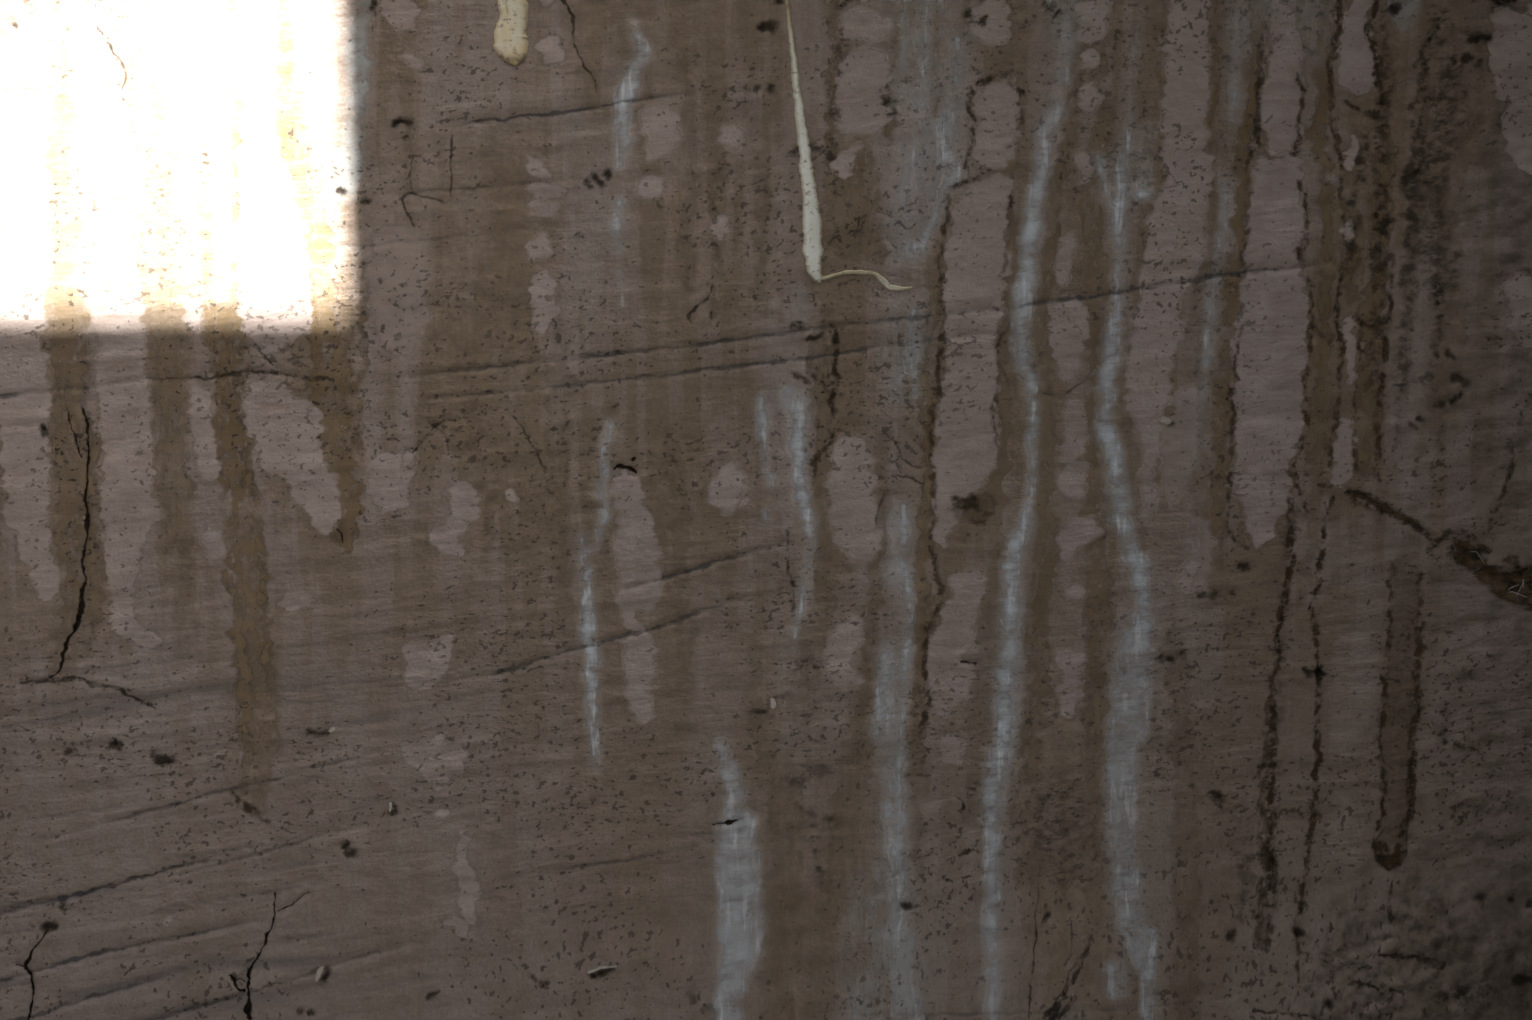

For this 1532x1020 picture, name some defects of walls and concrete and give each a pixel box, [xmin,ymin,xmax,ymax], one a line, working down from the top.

crack [16,932,47,1020]
water stain [40,0,111,638]
crack [20,407,155,708]
water stain [194,87,280,757]
crack [229,892,310,1020]
water stain [275,0,372,553]
water stain [581,551,599,755]
water stain [715,750,759,1020]
water stain [831,271,942,1020]
crack [1029,917,1072,1008]
water stain [981,38,1167,1019]
water stain [1202,0,1264,577]